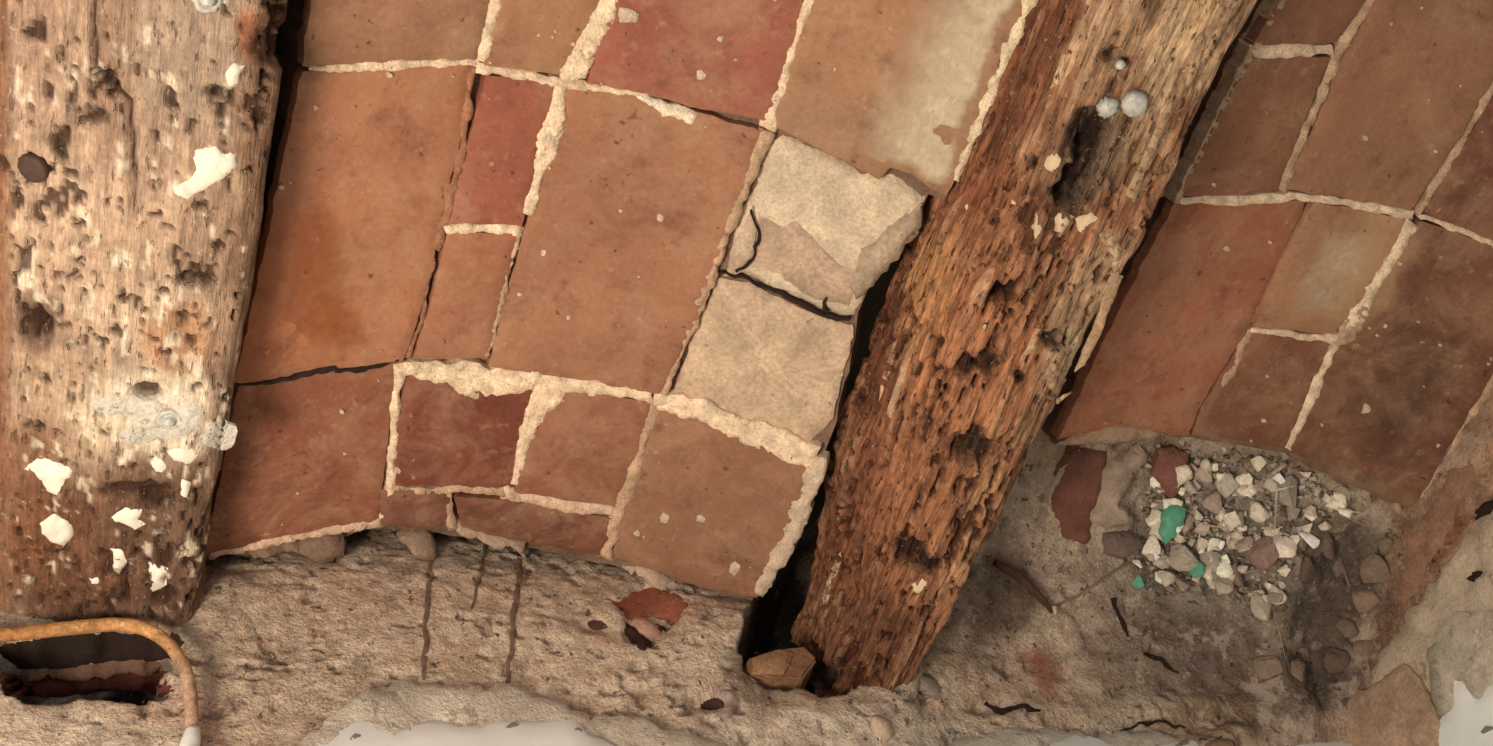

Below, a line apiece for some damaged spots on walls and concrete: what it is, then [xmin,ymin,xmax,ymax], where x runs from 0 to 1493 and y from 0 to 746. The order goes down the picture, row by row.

crack [719,209,851,321]
spalling [1036,426,1164,559]
spalling [0,632,185,698]
crack [421,560,435,680]
crack [470,545,523,683]
spalling [700,689,741,719]
flaking render [1347,608,1493,746]